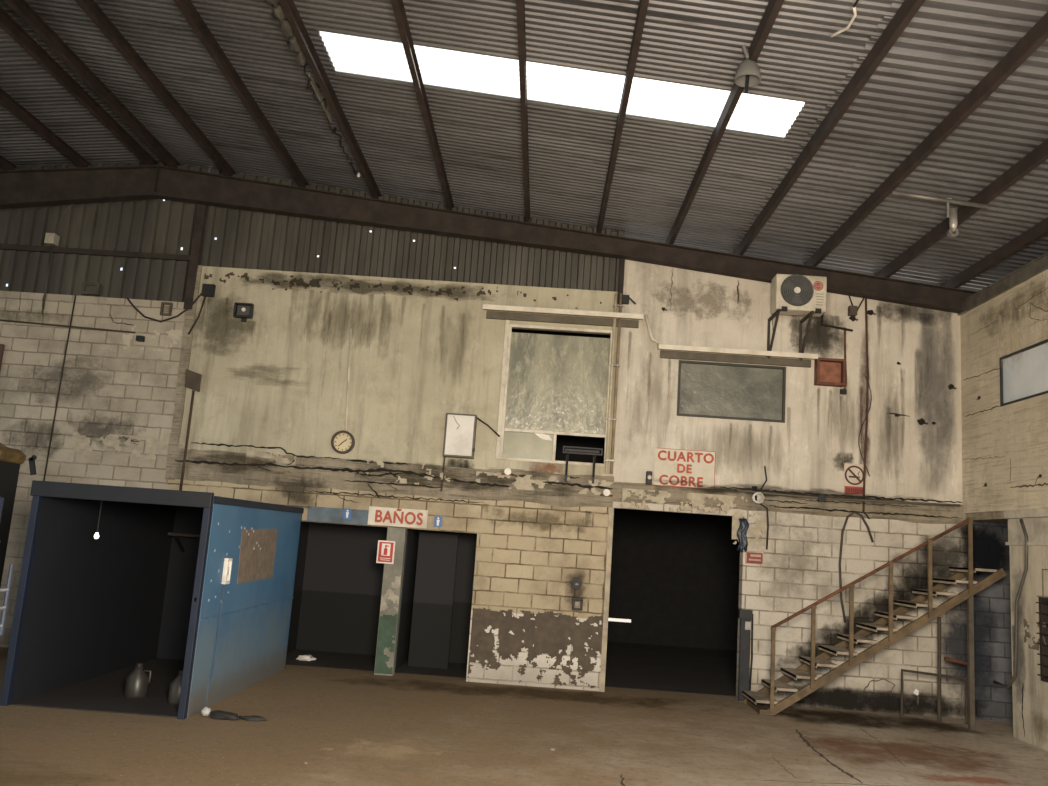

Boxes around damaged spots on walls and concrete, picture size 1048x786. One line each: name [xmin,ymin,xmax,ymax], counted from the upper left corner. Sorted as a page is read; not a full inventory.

leakage [204,272,498,301]
leakage [880,304,935,323]
peeling [245,451,296,468]
peeling [395,463,453,485]
peeling [374,575,401,674]
peeling [468,607,603,688]